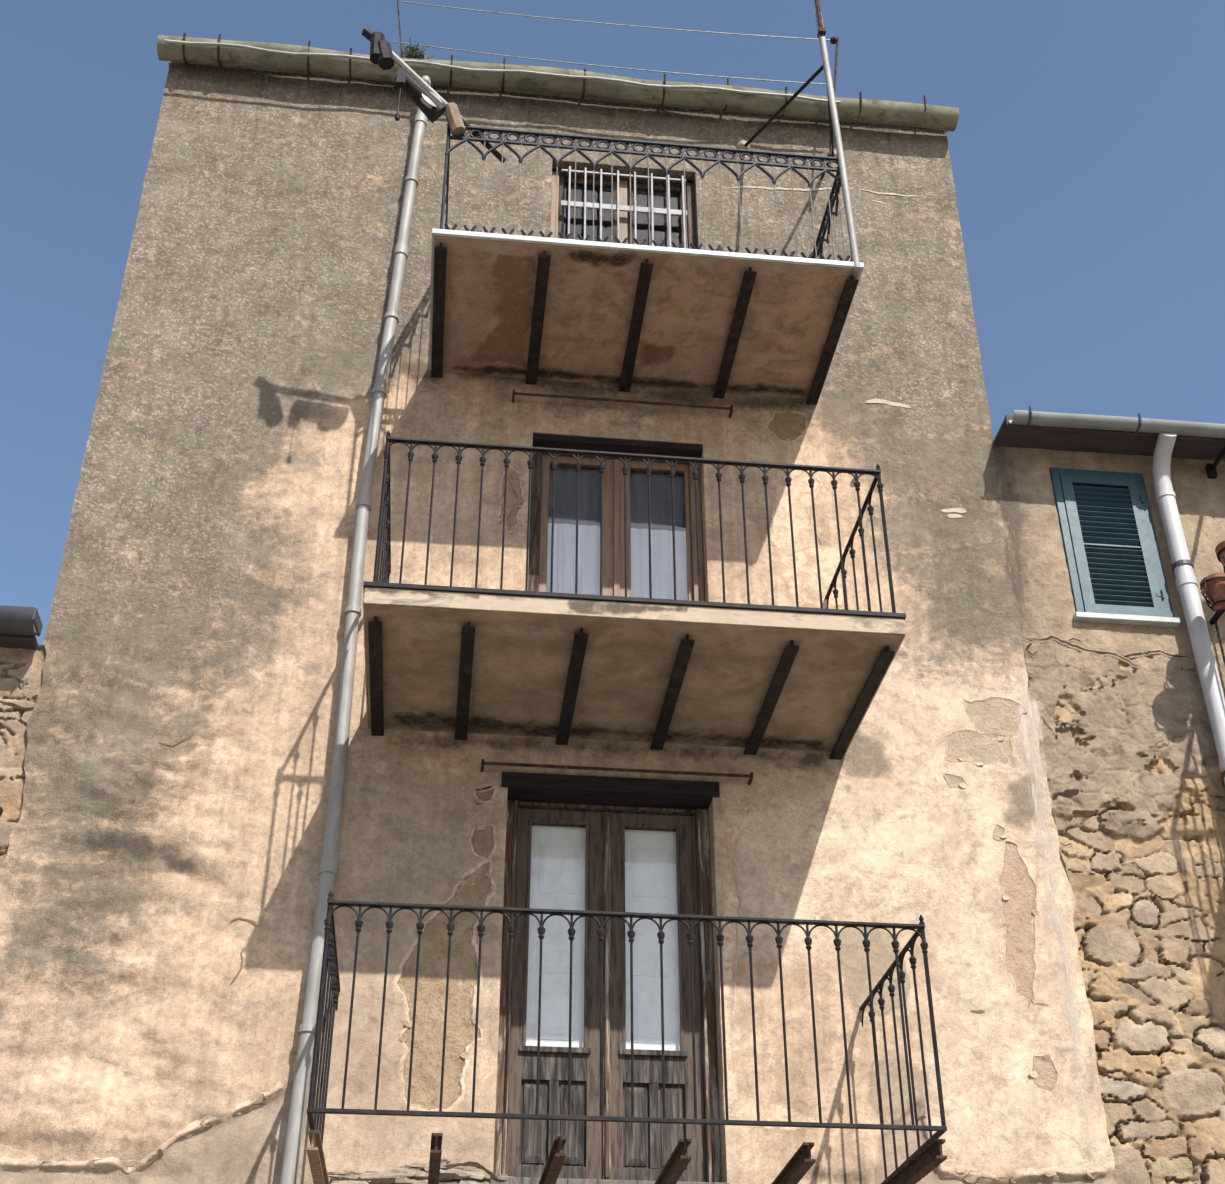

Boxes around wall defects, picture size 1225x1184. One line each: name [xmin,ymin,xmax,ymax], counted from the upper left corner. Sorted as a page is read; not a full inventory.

damp [570,252,632,266]
damp [449,256,803,408]
flaking render [497,466,526,534]
crack [1022,634,1191,686]
damp [395,713,822,766]
flaking render [942,696,1027,789]
damp [100,836,192,870]
flaking render [993,823,1039,1004]
flaking render [392,824,497,1112]
flaking render [0,1080,285,1174]